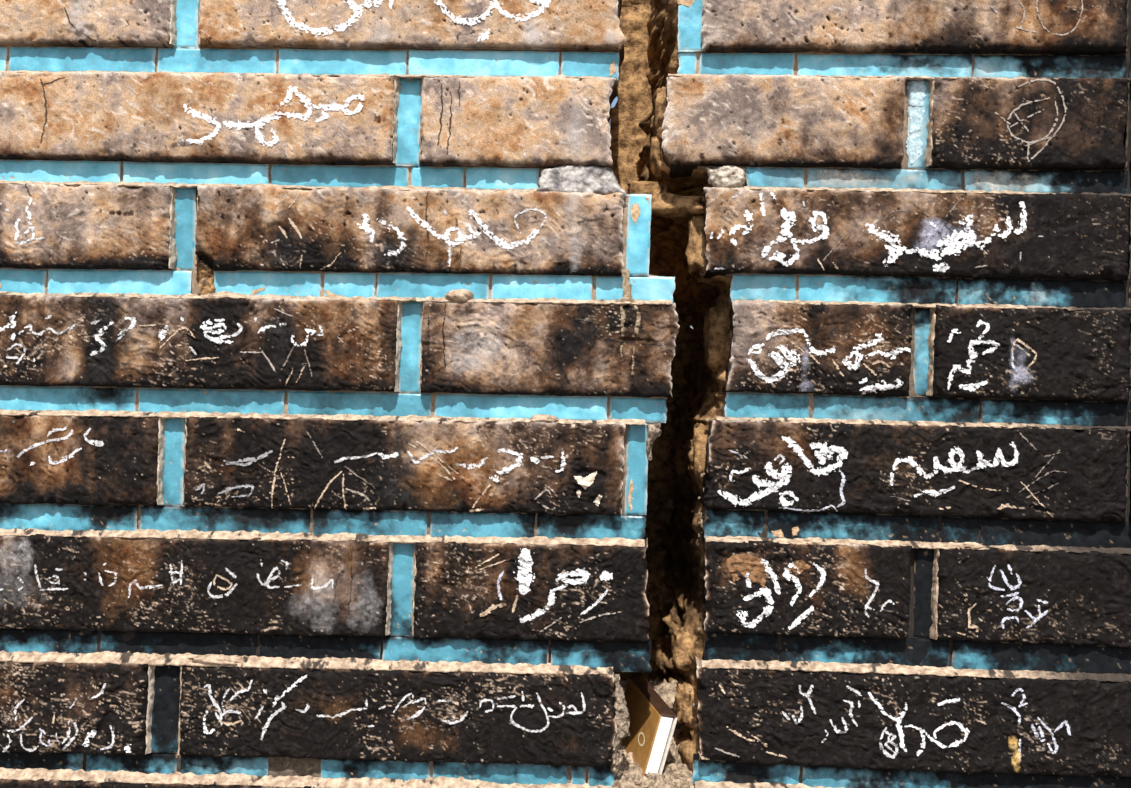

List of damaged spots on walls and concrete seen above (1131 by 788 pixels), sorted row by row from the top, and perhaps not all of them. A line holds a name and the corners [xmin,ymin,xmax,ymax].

crack [40,77,65,144]
crack [437,82,460,155]
crack [547,339,569,384]
crack [580,0,732,775]